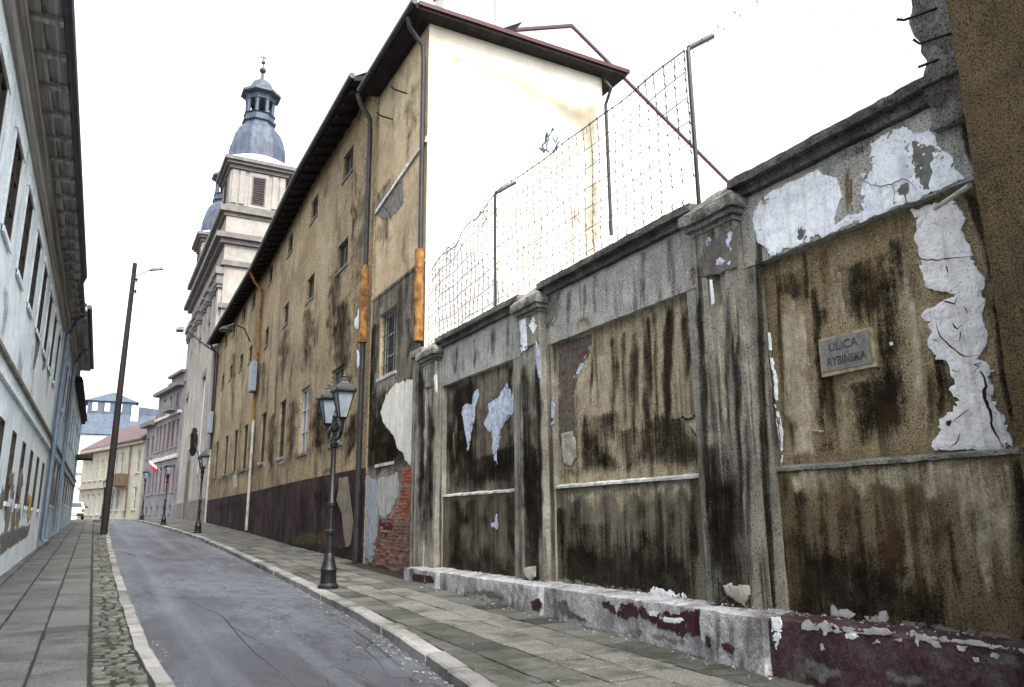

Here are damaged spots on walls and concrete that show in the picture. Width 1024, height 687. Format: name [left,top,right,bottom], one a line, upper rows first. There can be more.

peeling [753,126,965,256]
damp [261,154,358,398]
crack [914,252,973,273]
damp [964,194,991,281]
crack [933,298,1004,448]
damp [309,402,325,452]
peeling [462,383,513,465]
damp [447,363,544,582]
damp [557,229,1024,660]
peeling [558,578,735,657]
peeling [771,617,782,650]
peeling [801,604,1024,686]